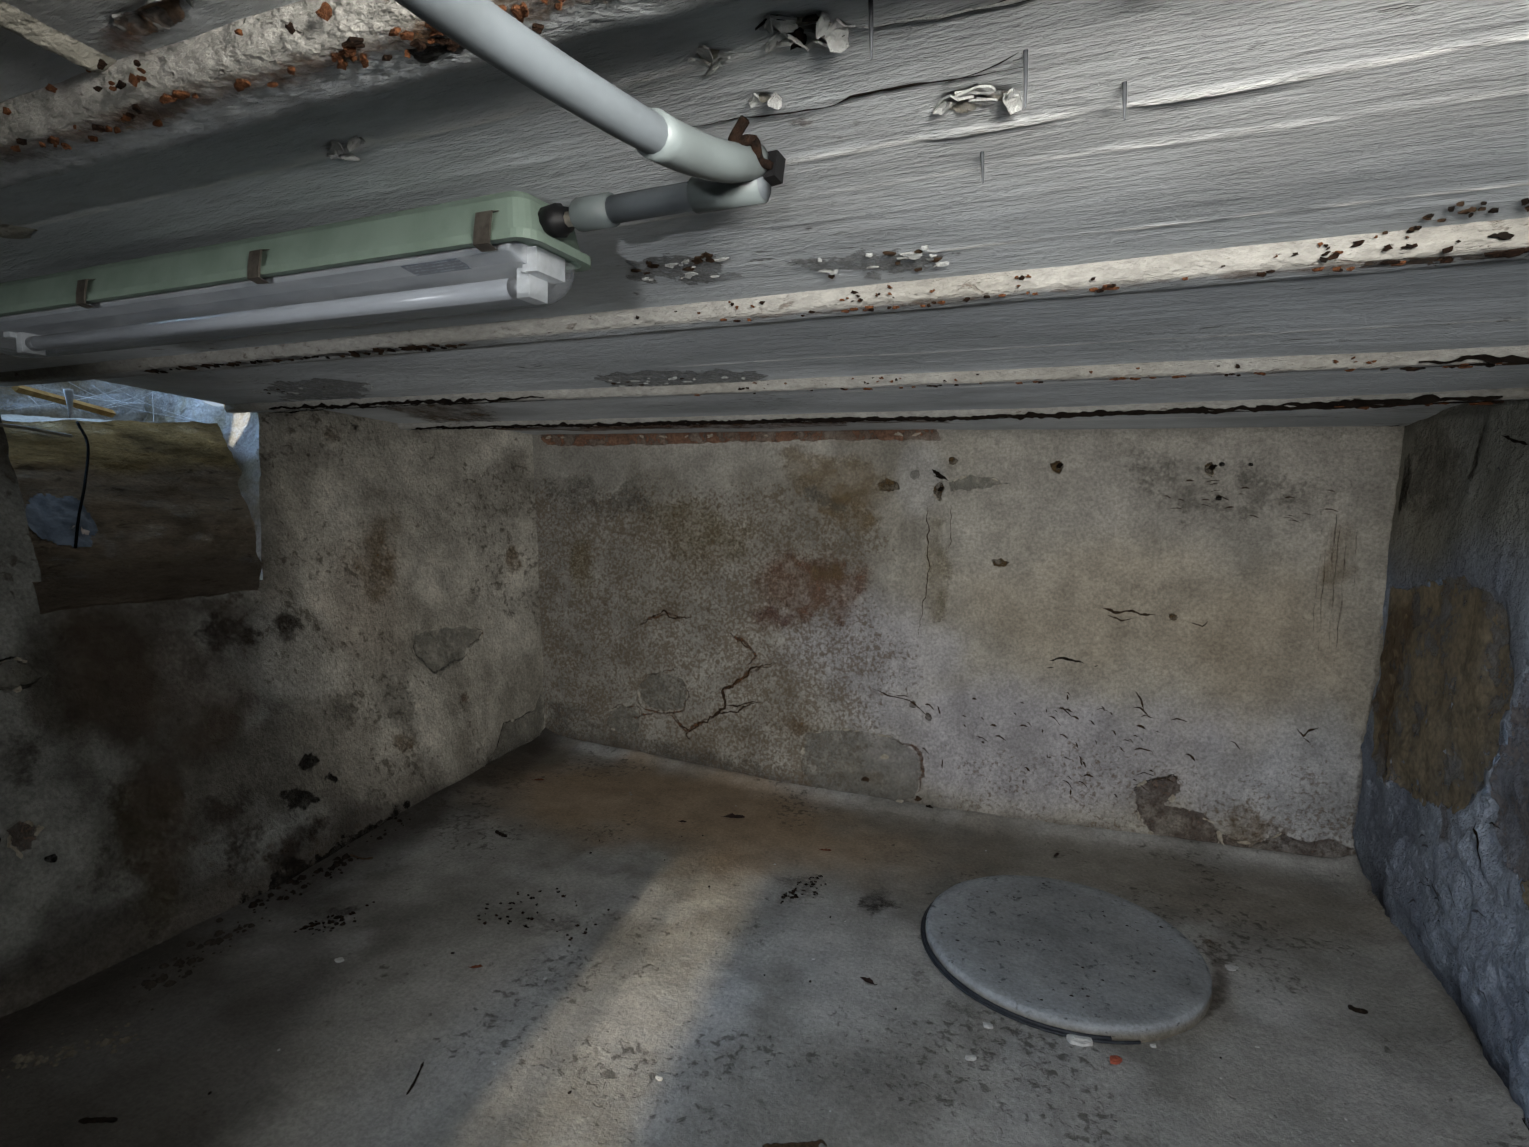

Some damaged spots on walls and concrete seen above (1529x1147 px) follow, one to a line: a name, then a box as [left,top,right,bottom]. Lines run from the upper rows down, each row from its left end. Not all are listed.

corrosion [315,1,332,22]
corrosion [0,36,369,158]
peeling [627,252,742,285]
peeling [791,245,961,280]
corrosion [1221,242,1355,279]
corrosion [801,285,945,317]
corrosion [963,274,1119,303]
peeling [594,368,769,387]
crack [640,609,690,625]
crack [670,633,776,741]
peeling [1371,576,1529,910]
flaking render [1132,774,1354,857]